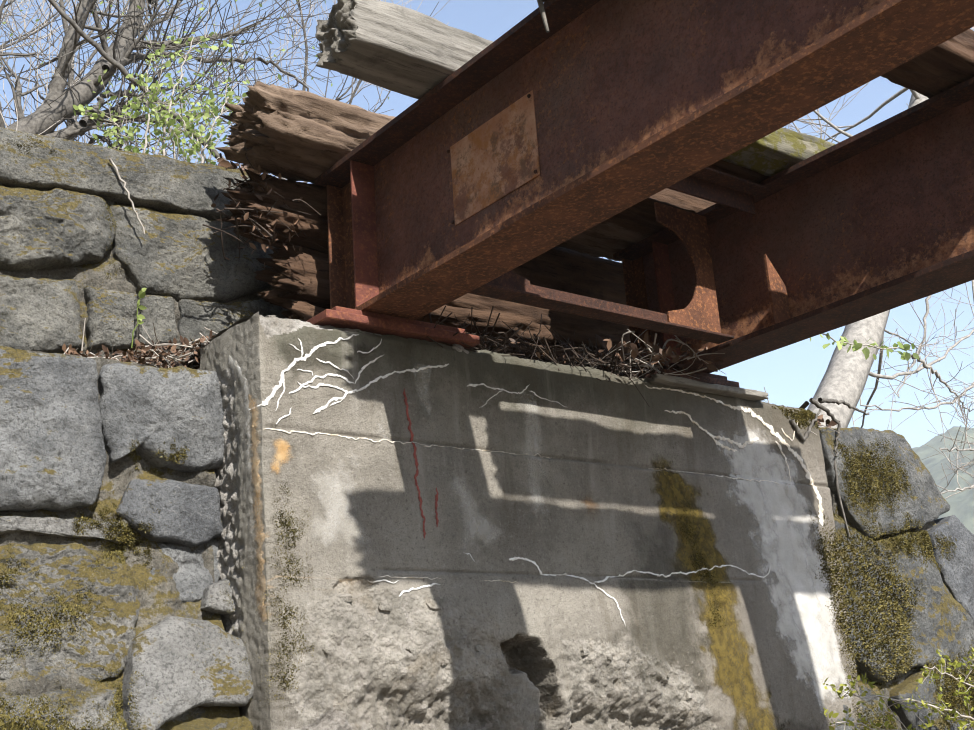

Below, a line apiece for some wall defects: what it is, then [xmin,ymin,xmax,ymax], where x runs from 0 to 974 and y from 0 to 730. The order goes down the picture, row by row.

corrosion [228,355,264,542]
crack [249,334,549,458]
crack [467,383,565,408]
crack [665,410,759,452]
crack [648,468,780,485]
water stain [645,385,850,705]
crack [368,575,441,596]
crack [463,552,770,626]
spalling [285,577,725,730]